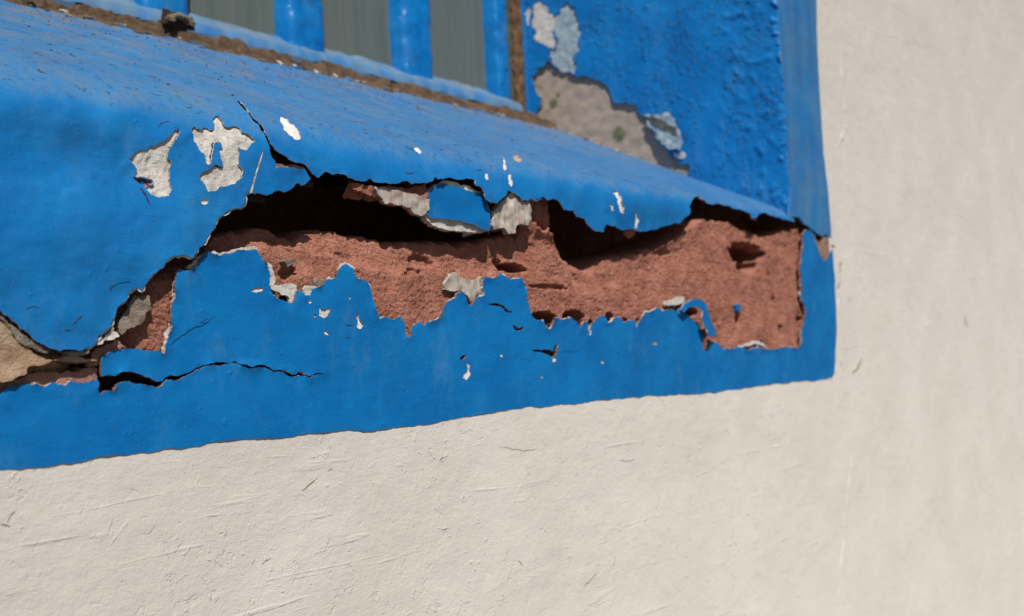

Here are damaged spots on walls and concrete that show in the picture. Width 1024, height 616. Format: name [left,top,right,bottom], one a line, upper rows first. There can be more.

peeling [129,130,178,205]
peeling [192,116,254,204]
crack [239,104,313,203]
peeling [280,116,300,140]
peeling [525,2,691,175]
spalling [0,155,819,390]
crack [70,362,321,393]